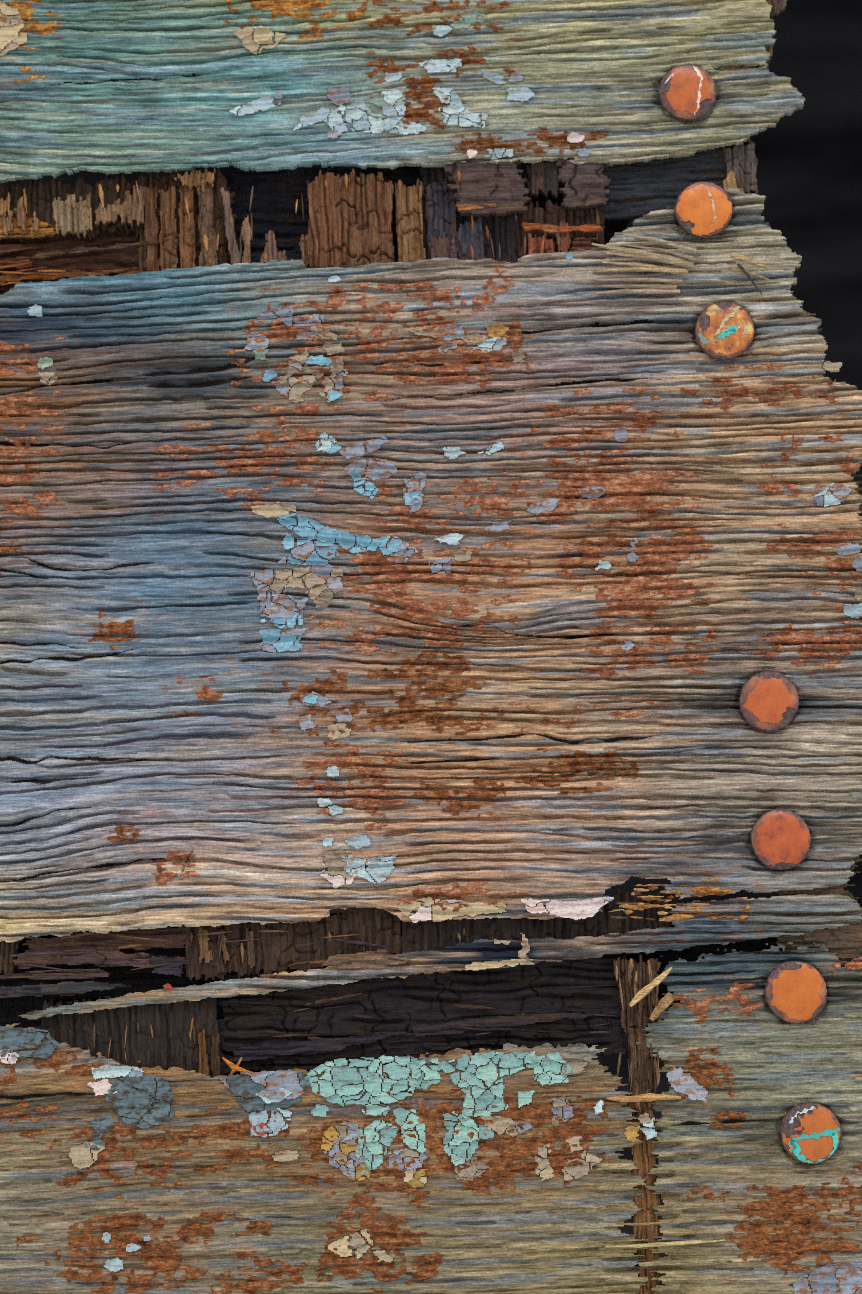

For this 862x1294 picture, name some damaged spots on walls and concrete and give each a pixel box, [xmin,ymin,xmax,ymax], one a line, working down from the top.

peeling [0,1,27,56]
rust [224,0,510,39]
rust [366,46,609,155]
peeling [484,520,512,532]
peeling [251,503,472,653]
peeling [0,1026,60,1064]
peeling [69,1065,174,1169]
peeling [220,1051,587,1188]
peeling [535,1136,602,1181]
peeling [328,1229,393,1263]